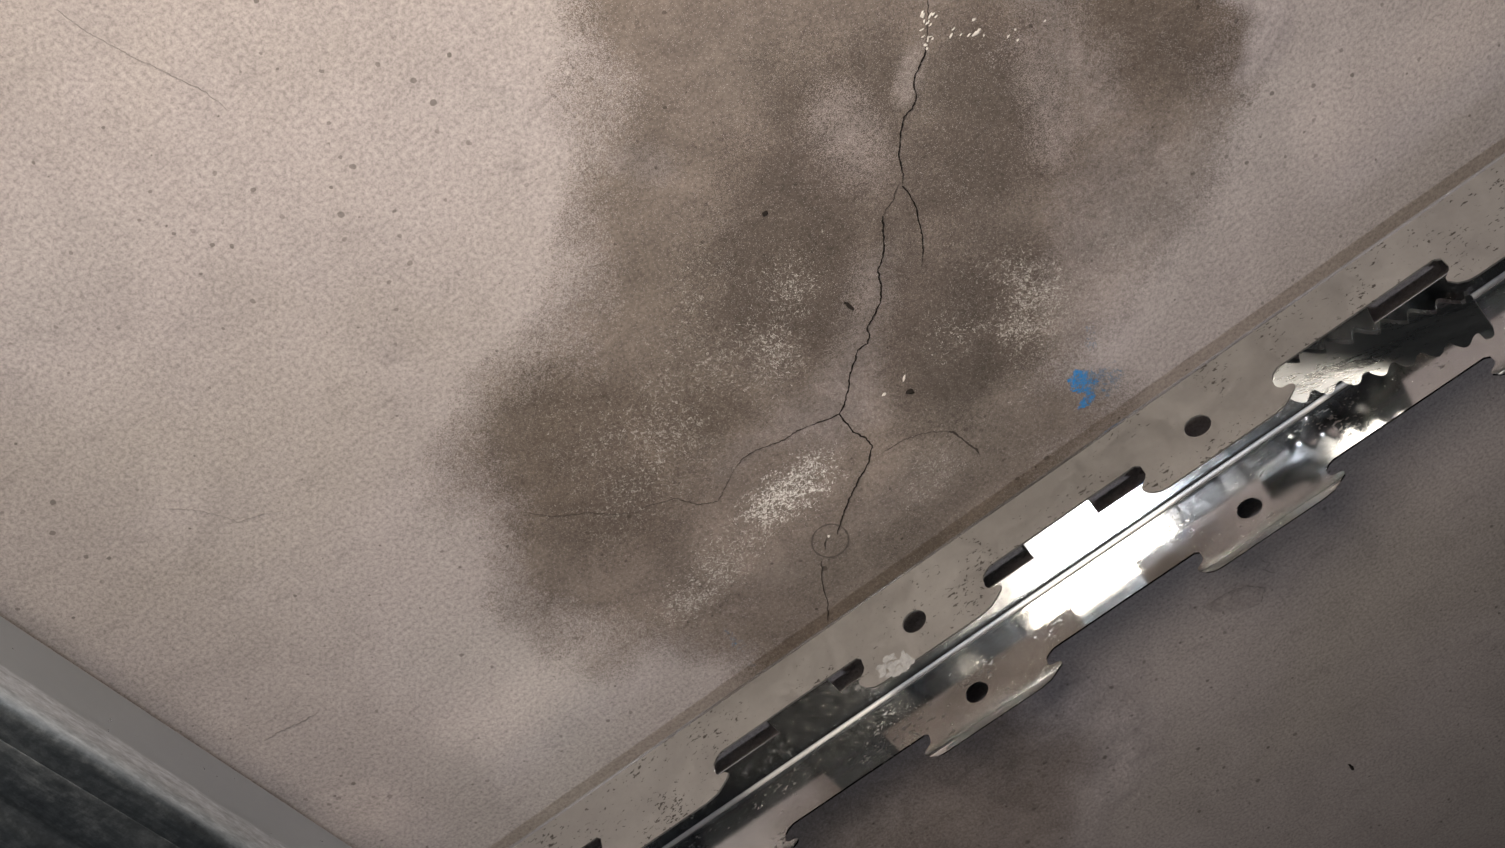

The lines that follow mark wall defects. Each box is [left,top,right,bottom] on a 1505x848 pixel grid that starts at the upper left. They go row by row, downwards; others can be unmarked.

crack [524,0,981,620]
leakage [385,0,1301,696]